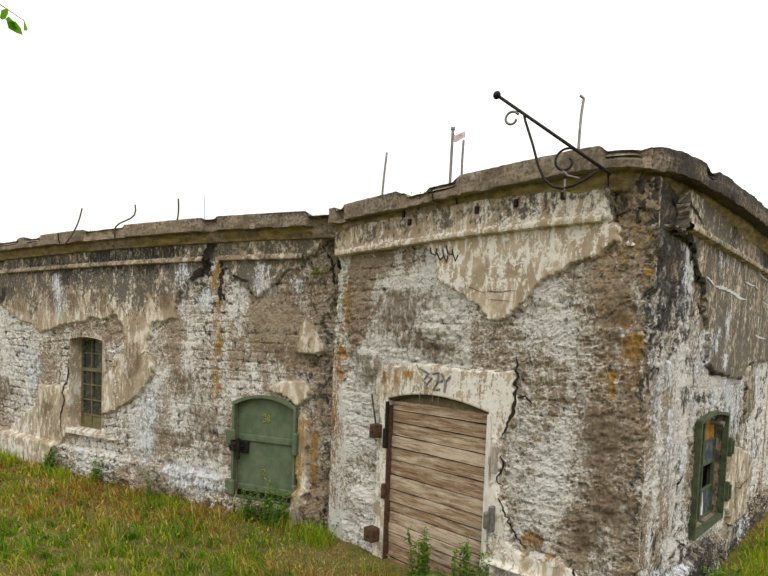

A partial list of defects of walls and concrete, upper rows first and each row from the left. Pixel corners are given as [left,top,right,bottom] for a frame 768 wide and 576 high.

crack [667,197,768,316]
spalling [0,304,125,431]
spalling [49,147,768,576]
leakage [646,226,760,505]
leakage [573,407,642,554]